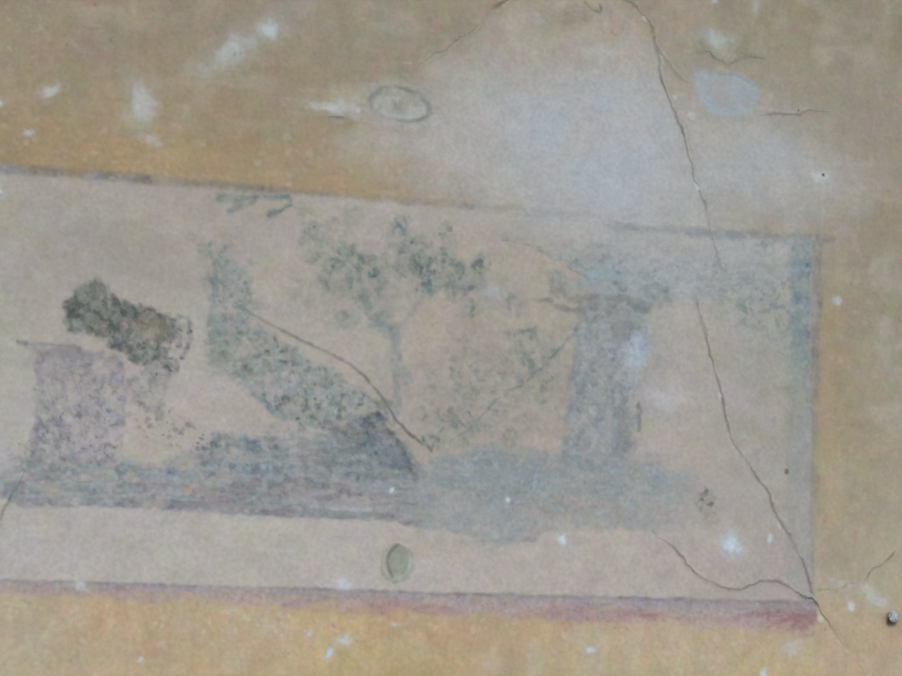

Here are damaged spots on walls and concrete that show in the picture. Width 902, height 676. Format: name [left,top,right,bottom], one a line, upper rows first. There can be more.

crack [410,0,513,75]
crack [621,0,897,648]
crack [0,467,28,542]